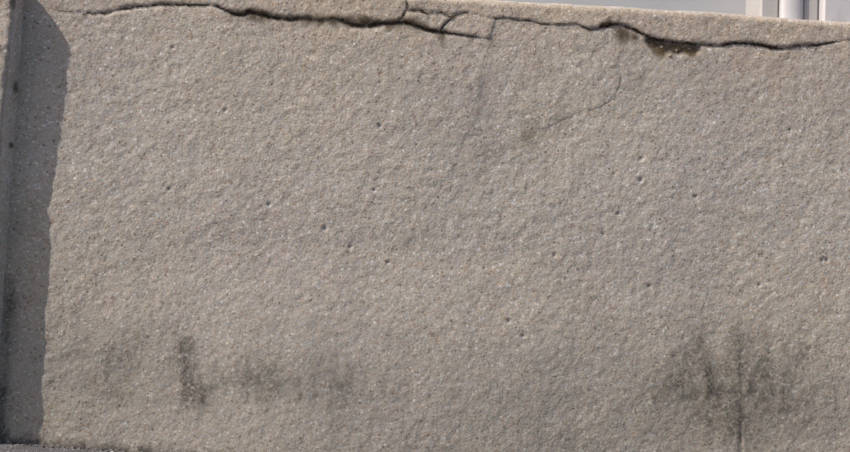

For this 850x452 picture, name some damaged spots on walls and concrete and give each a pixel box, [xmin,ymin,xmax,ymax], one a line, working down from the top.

crack [57,3,298,20]
crack [332,0,849,50]